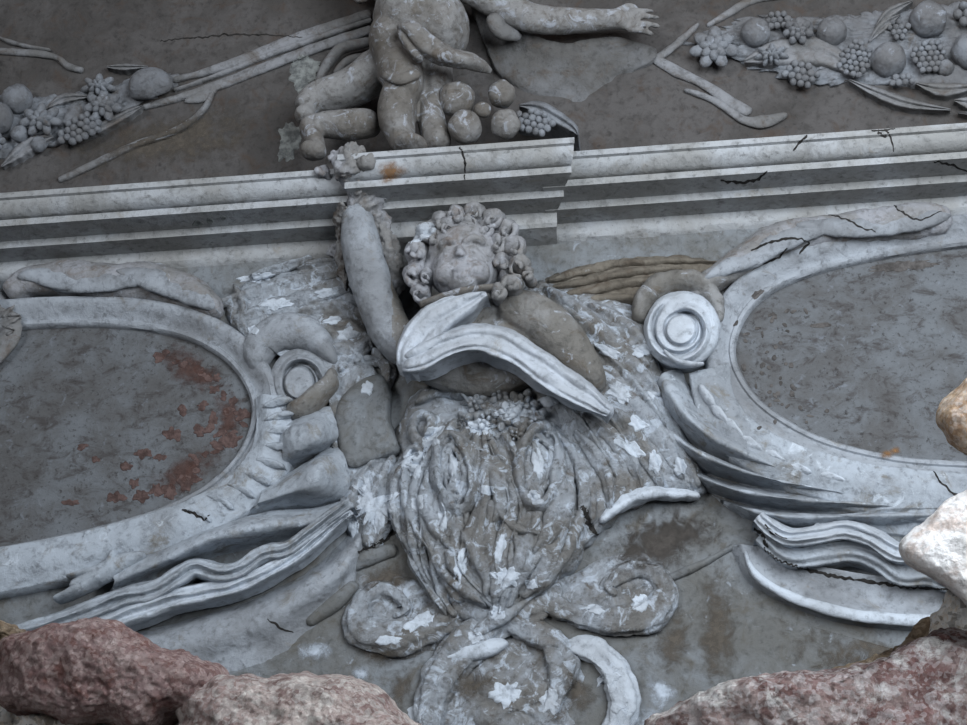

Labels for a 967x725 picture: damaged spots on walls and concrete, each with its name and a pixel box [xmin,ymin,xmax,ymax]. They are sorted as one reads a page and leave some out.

crack [871,128,895,152]
crack [934,160,967,172]
crack [828,214,876,233]
crack [894,205,941,221]
crack [751,237,810,265]
crack [933,471,957,496]
water stain [622,514,721,568]
water stain [364,565,405,588]
water stain [701,584,733,674]
water stain [300,645,330,656]
water stain [361,649,395,661]
water stain [566,678,589,710]